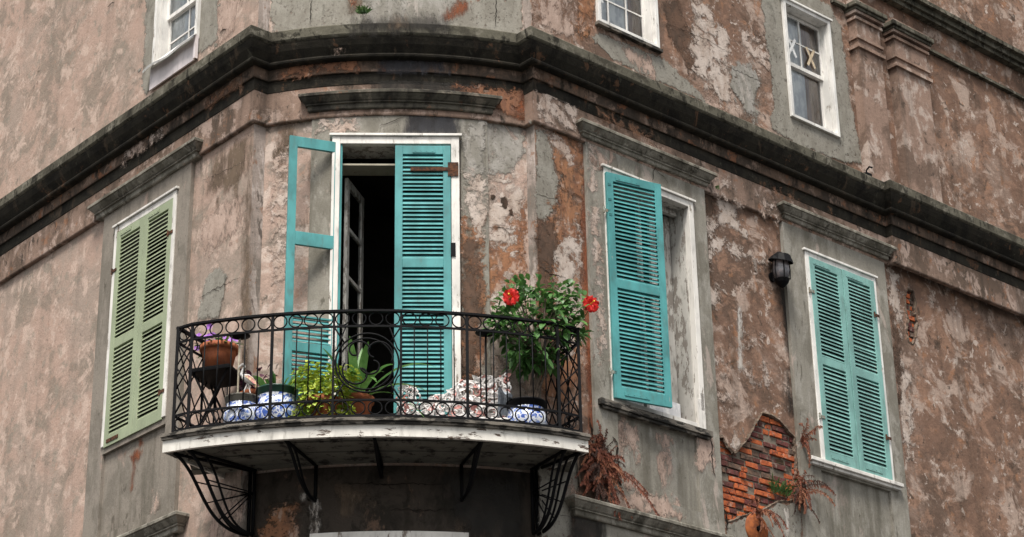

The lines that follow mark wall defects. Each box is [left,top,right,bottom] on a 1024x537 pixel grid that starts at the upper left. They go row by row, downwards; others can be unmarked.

corrosion [279,61,361,80]
peeling [686,0,771,110]
peeling [460,91,616,404]
peeling [706,177,772,311]
spalling [886,267,919,345]
peeling [715,330,789,416]
peeling [566,416,686,521]
spalling [695,411,798,524]